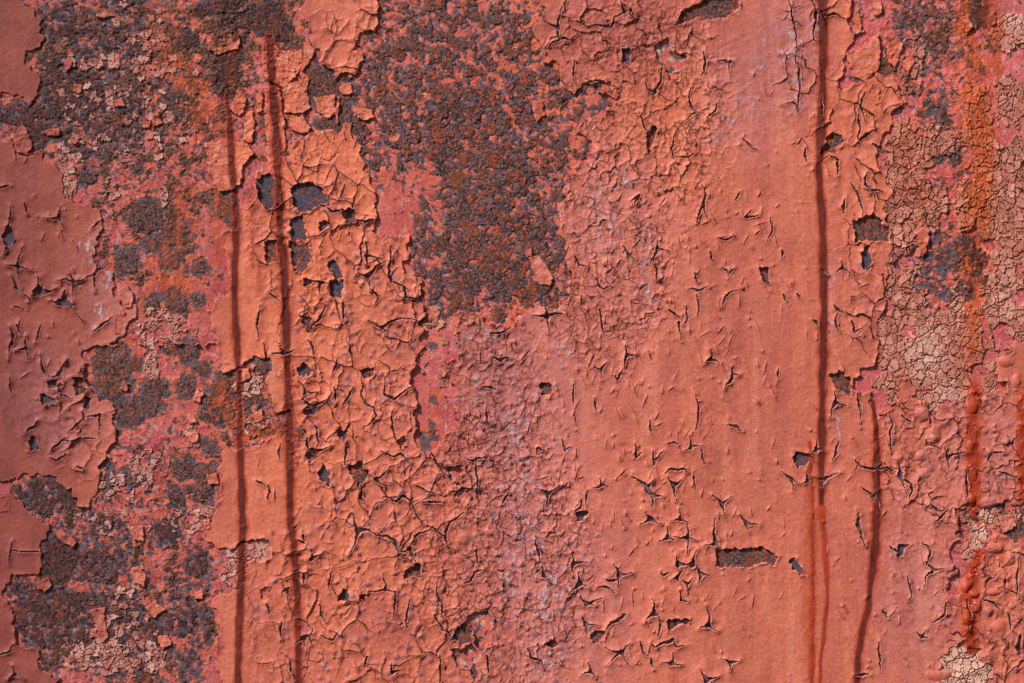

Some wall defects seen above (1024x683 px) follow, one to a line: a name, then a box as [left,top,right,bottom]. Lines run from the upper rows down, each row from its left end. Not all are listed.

rust [0,0,303,683]
peeling [0,0,615,683]
crack [256,279,486,683]
crack [328,185,425,330]
rust [304,0,613,328]
crack [535,399,759,682]
peeling [677,0,741,25]
peeling [715,546,806,575]
rust [808,0,829,683]
rust [853,400,882,683]
crack [781,391,1017,597]
peeling [829,0,1024,418]